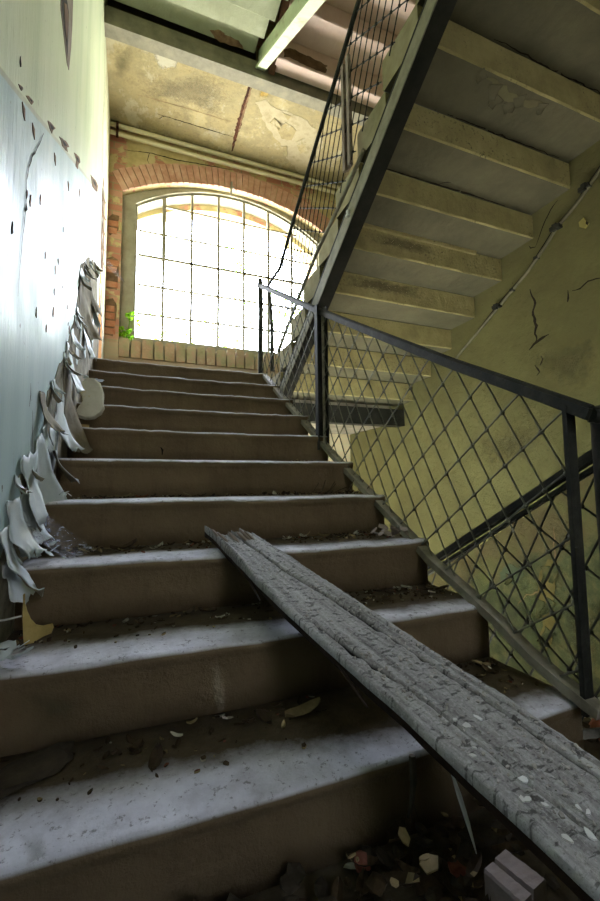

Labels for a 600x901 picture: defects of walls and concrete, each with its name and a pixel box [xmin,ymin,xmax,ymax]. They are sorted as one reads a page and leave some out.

spalling [60,0,73,70]
spalling [210,30,243,49]
spalling [18,84,35,140]
spalling [48,121,80,169]
peeling [255,99,323,174]
crack [18,133,44,289]
crack [567,278,600,302]
crack [529,290,549,376]
peeling [0,175,119,661]